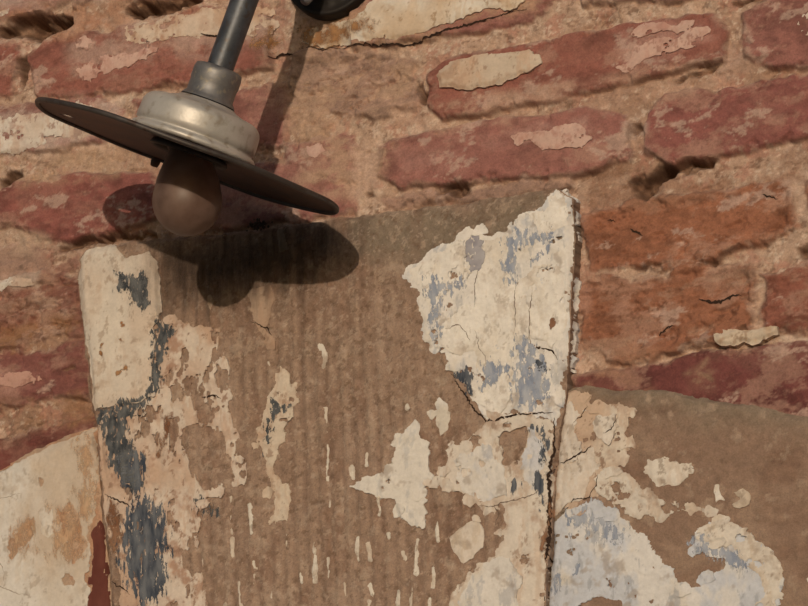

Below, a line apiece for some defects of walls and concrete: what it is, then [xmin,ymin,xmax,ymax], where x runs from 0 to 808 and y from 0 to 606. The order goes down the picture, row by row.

spalling [727,0,765,9]
peeling [615,20,711,73]
peeling [0,113,90,156]
peeling [248,285,276,350]
crack [513,287,558,360]
peeling [349,155,795,606]
peeling [0,314,247,606]
peeling [251,366,300,525]